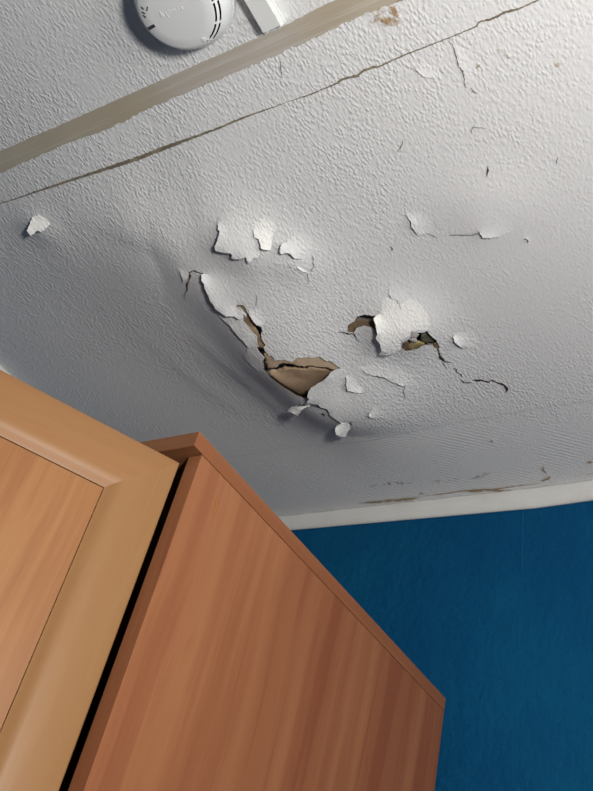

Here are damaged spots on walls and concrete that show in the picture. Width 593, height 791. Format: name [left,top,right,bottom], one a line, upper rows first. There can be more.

peeling [27,215,50,236]
peeling [215,206,313,273]
peeling [405,210,434,236]
peeling [447,206,513,238]
peeling [201,268,267,371]
peeling [287,282,430,437]
peeling [453,330,481,349]
crack [437,349,508,392]